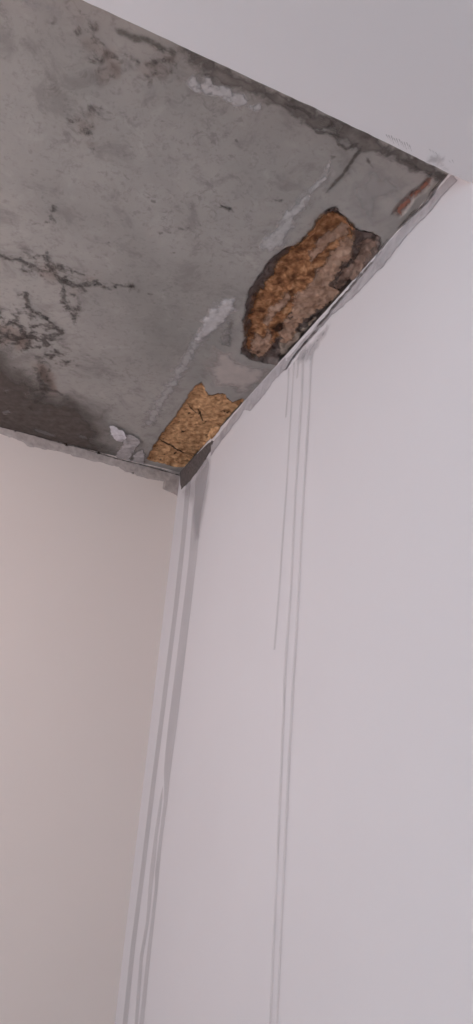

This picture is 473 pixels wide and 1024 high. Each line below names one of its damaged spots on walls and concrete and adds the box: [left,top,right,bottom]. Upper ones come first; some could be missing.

spalling [0,175,457,495]